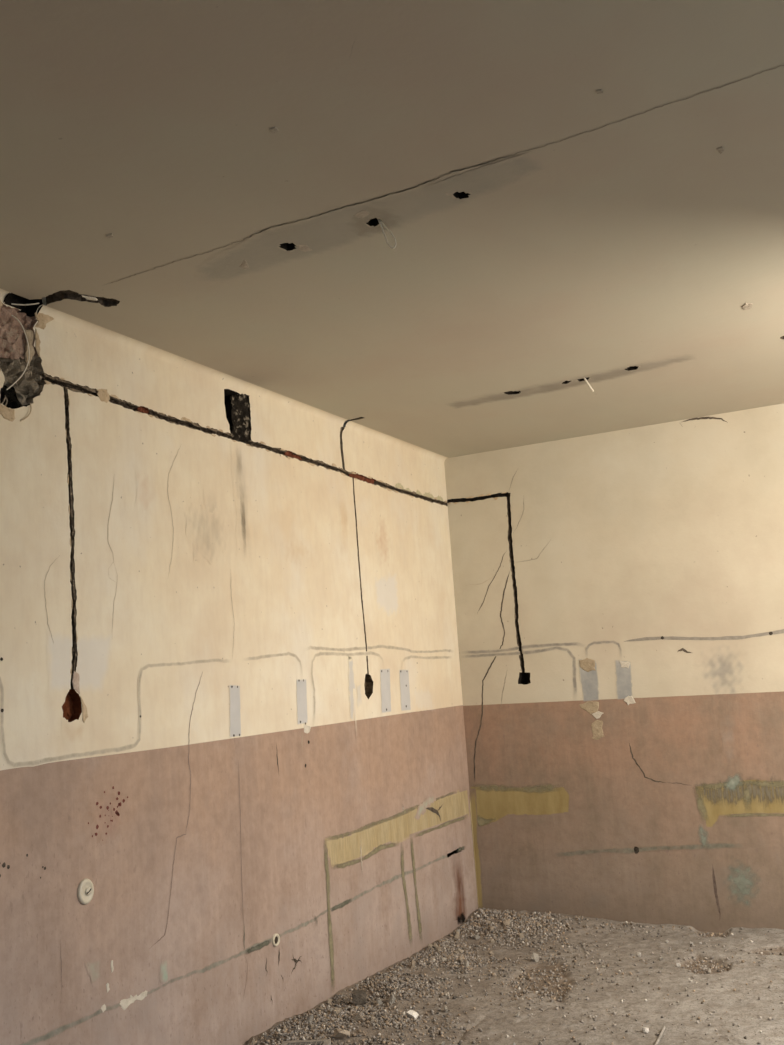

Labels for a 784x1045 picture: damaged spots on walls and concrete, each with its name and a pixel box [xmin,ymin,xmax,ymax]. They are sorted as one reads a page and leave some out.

crack [102,65,784,286]
spalling [0,290,120,368]
spalling [0,403,15,422]
spalling [206,389,270,452]
crack [466,471,550,778]
crack [629,744,686,785]
crack [155,672,203,944]
peeling [120,990,147,1010]